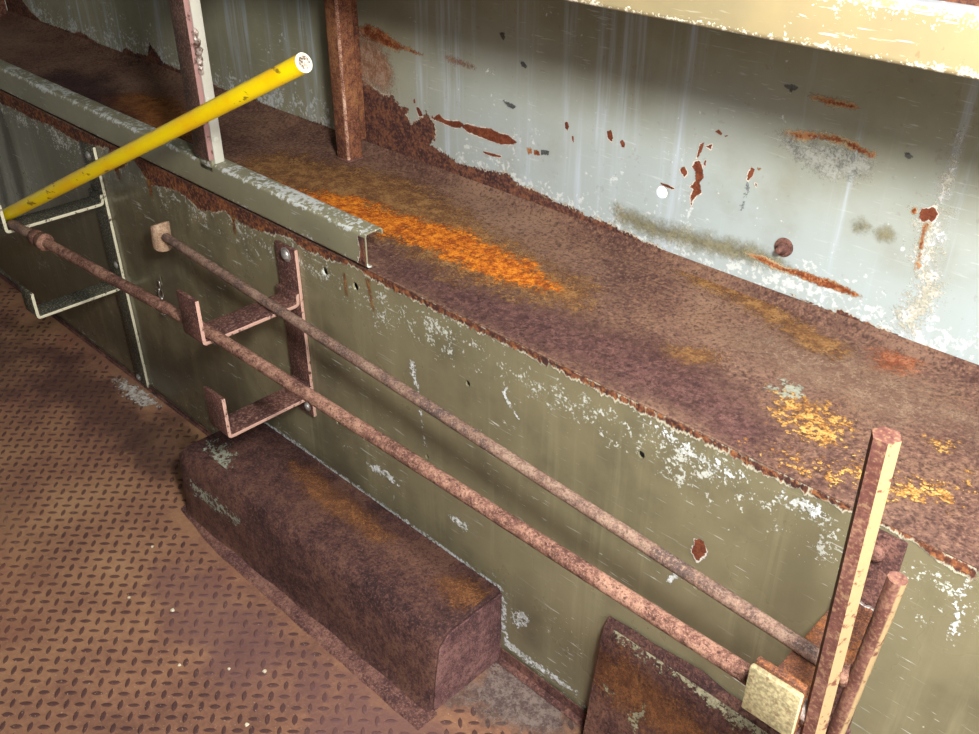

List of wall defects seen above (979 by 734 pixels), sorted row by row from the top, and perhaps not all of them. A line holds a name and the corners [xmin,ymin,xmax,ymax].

corrosion [0,0,181,74]
corrosion [0,91,118,153]
corrosion [359,23,666,251]
peeling [778,130,876,181]
peeling [790,132,962,337]
corrosion [114,150,979,515]
peeling [643,418,750,487]
corrosion [288,461,397,542]
peeling [778,489,831,522]
peeling [690,538,708,563]
corrosion [880,522,978,581]
corrosion [429,574,489,613]